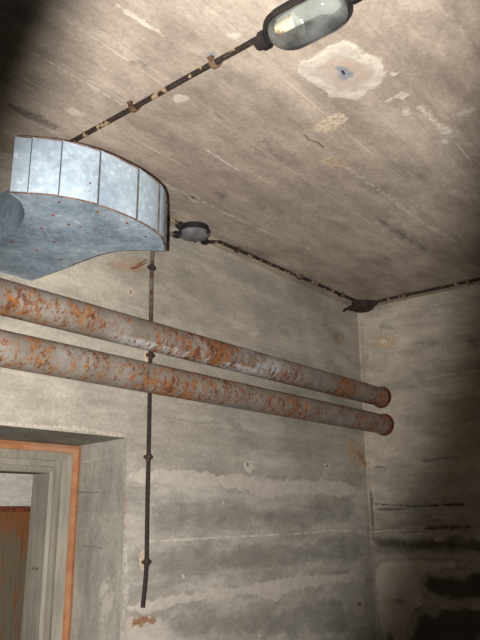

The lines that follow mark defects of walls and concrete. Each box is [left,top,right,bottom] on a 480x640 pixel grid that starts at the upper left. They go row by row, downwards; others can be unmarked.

spalling [312,113,349,134]
water stain [149,491,366,586]
water stain [410,573,480,640]